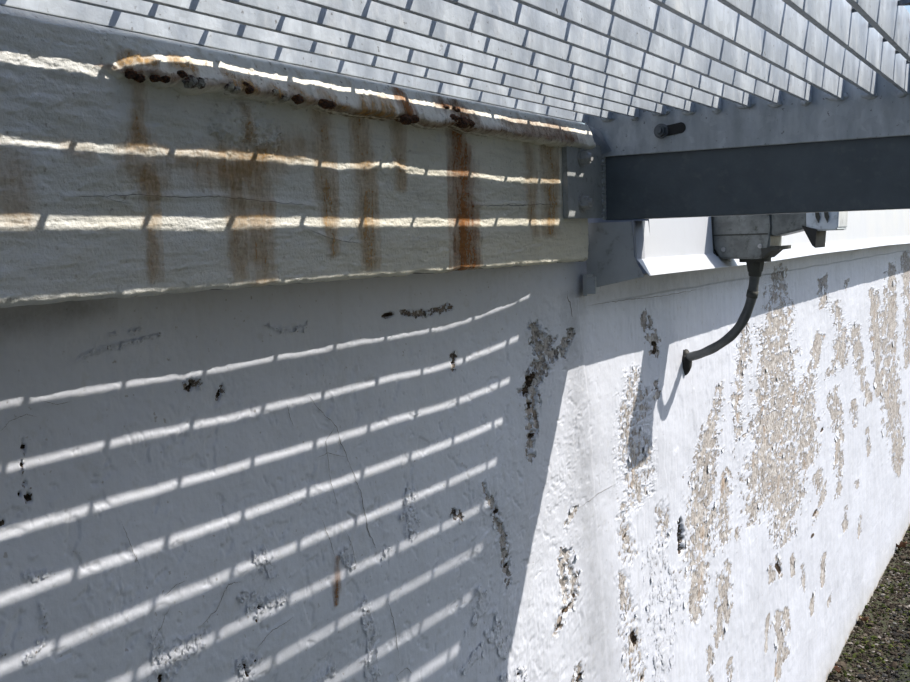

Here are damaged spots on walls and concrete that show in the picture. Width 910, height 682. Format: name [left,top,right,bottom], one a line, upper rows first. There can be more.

rust [111,52,157,74]
rust [169,57,195,82]
rust [329,87,574,271]
peeling [381,303,453,319]
spalling [640,309,661,358]
spalling [182,379,203,392]
spalling [518,321,576,463]
peeling [727,250,910,616]
crack [316,406,376,566]
peeling [482,482,512,589]
peeling [655,500,688,555]
spalling [552,546,582,637]